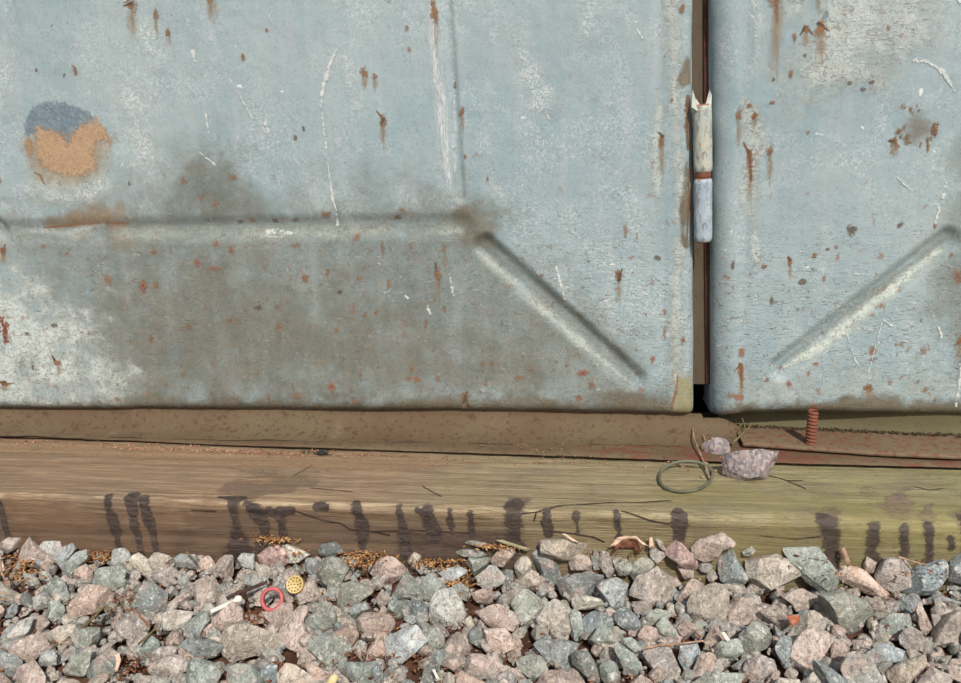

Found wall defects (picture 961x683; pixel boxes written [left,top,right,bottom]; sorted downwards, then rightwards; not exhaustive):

rust [769,0,780,44]
rust [793,10,830,41]
peeling [24,101,113,202]
rust [743,142,754,181]
rust [888,121,939,152]
rust [680,166,690,248]
leakage [0,164,670,412]